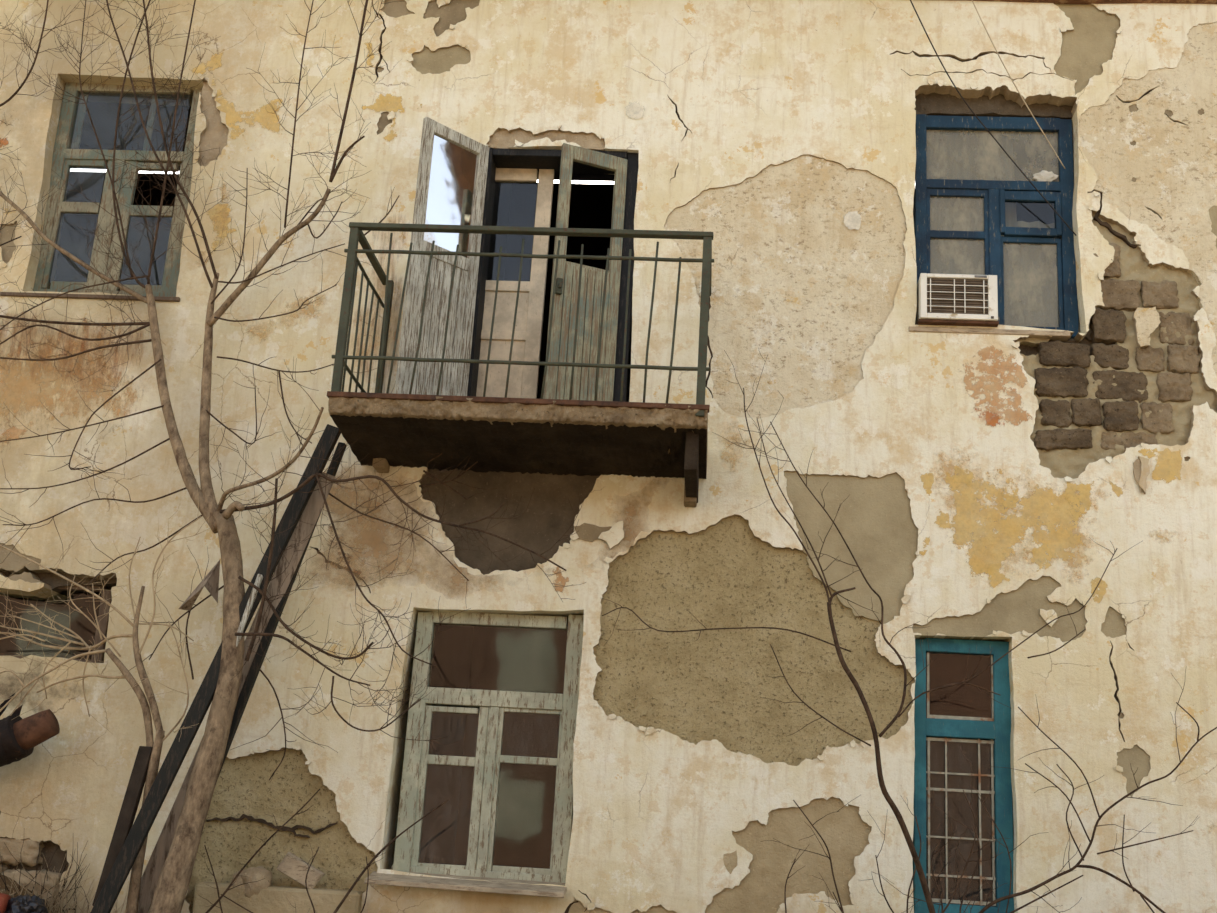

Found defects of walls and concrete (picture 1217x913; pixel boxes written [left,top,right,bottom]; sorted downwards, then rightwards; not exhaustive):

flaking render [381,0,480,74]
crack [894,52,1043,77]
flaking render [1050,4,1122,96]
flaking render [0,222,17,268]
flaking render [664,155,907,419]
flaking render [912,22,1217,642]
flaking render [420,468,930,766]
crack [1109,648,1124,741]
flaking render [1115,745,1150,797]
flaking render [187,742,378,913]
flaking render [705,797,871,913]
flaking render [631,904,677,913]